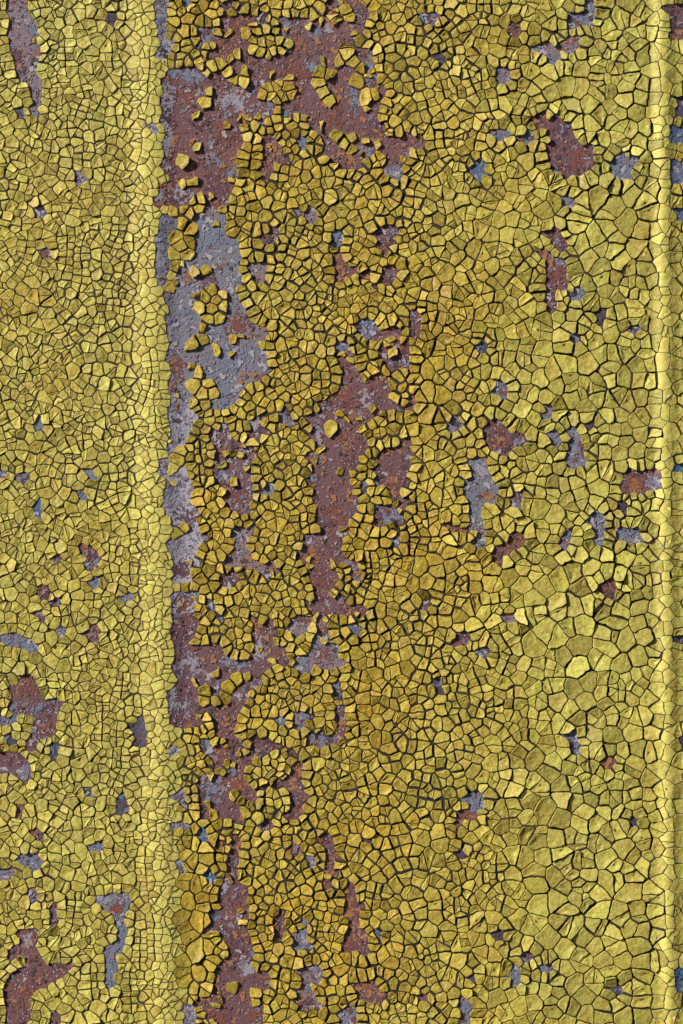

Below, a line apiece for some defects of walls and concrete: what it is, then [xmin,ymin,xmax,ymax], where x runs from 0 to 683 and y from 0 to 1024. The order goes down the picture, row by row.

crack [229,0,325,61]
corrosion [152,0,426,231]
crack [0,0,231,828]
corrosion [158,235,270,405]
peeling [149,0,452,1024]
corrosion [290,312,422,635]
crack [350,438,381,489]
peeling [441,418,654,712]
peeling [585,463,683,546]
peeling [0,674,63,783]
corrosion [167,591,346,823]
crack [617,960,660,988]